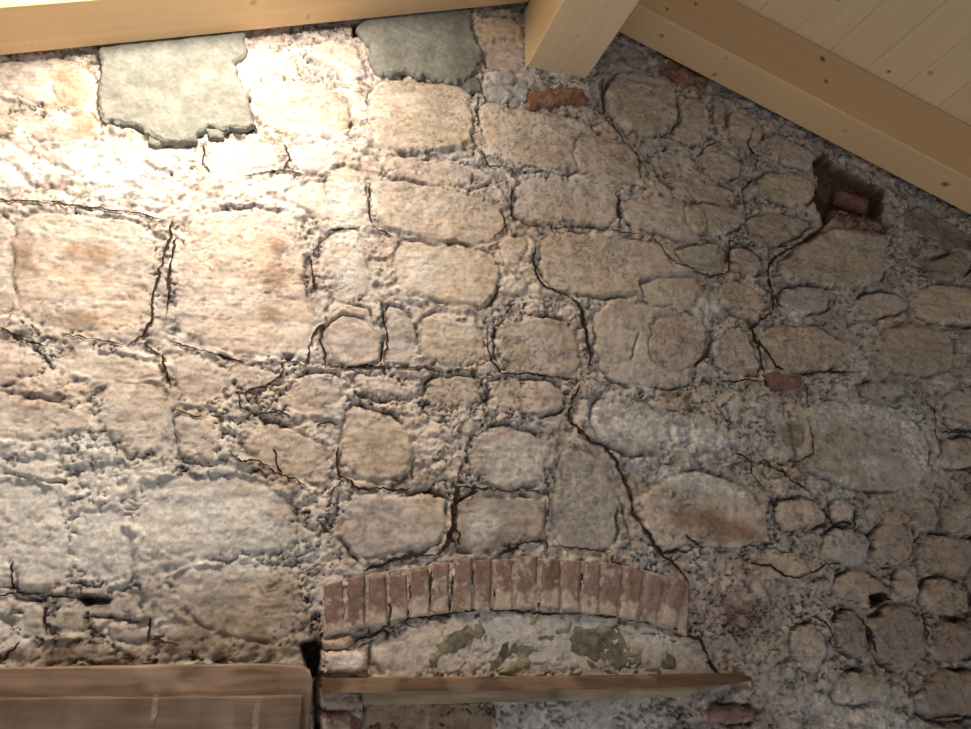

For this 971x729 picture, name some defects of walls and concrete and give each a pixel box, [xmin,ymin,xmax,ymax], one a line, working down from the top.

crack [601,79,647,168]
crack [309,185,410,291]
spalling [812,164,887,235]
crack [0,198,243,385]
crack [237,307,426,419]
crack [480,148,857,583]
crack [228,449,308,488]
crack [316,421,410,505]
crack [354,485,718,673]